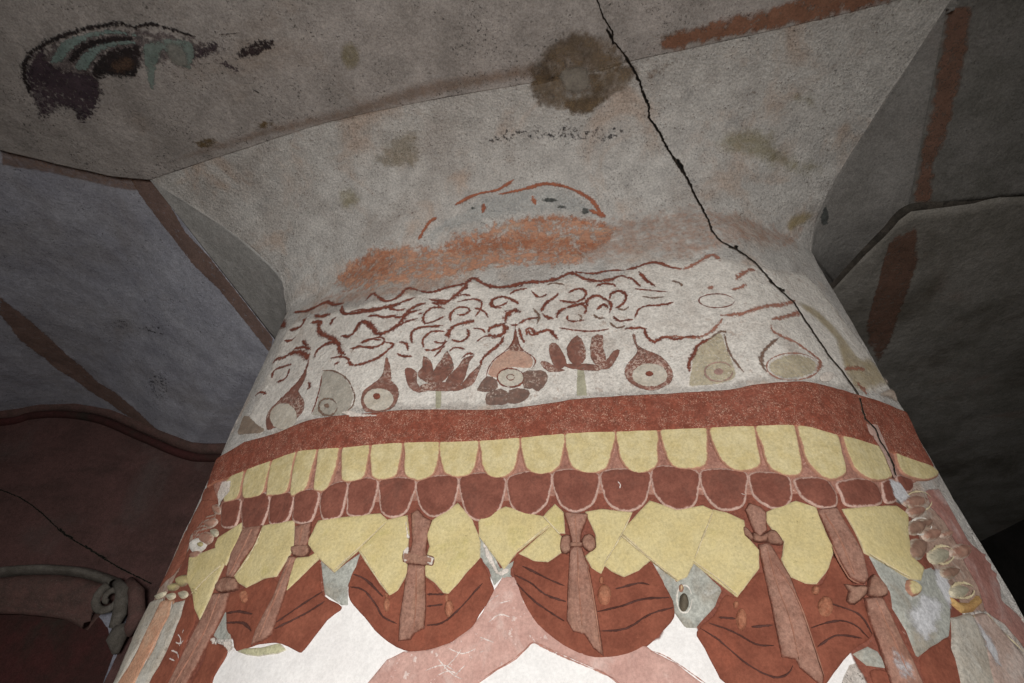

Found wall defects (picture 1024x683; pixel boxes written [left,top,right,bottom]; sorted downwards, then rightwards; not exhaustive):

water stain [531,33,633,113]
crack [596,0,897,476]
crack [0,489,152,584]